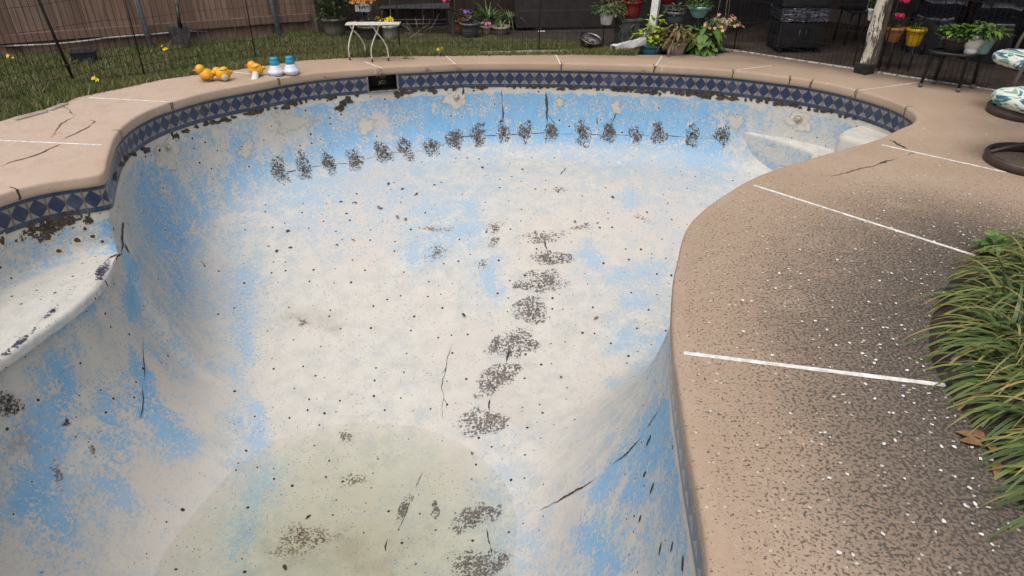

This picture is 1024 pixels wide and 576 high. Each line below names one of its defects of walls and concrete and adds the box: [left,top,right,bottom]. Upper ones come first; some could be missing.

spalling [171,92,359,140]
spalling [394,86,488,99]
crack [441,90,561,146]
spalling [506,84,876,148]
crack [2,107,122,200]
crack [833,140,914,176]
spalling [0,209,106,255]
crack [109,223,129,258]
crack [138,350,146,418]
crack [540,481,592,510]